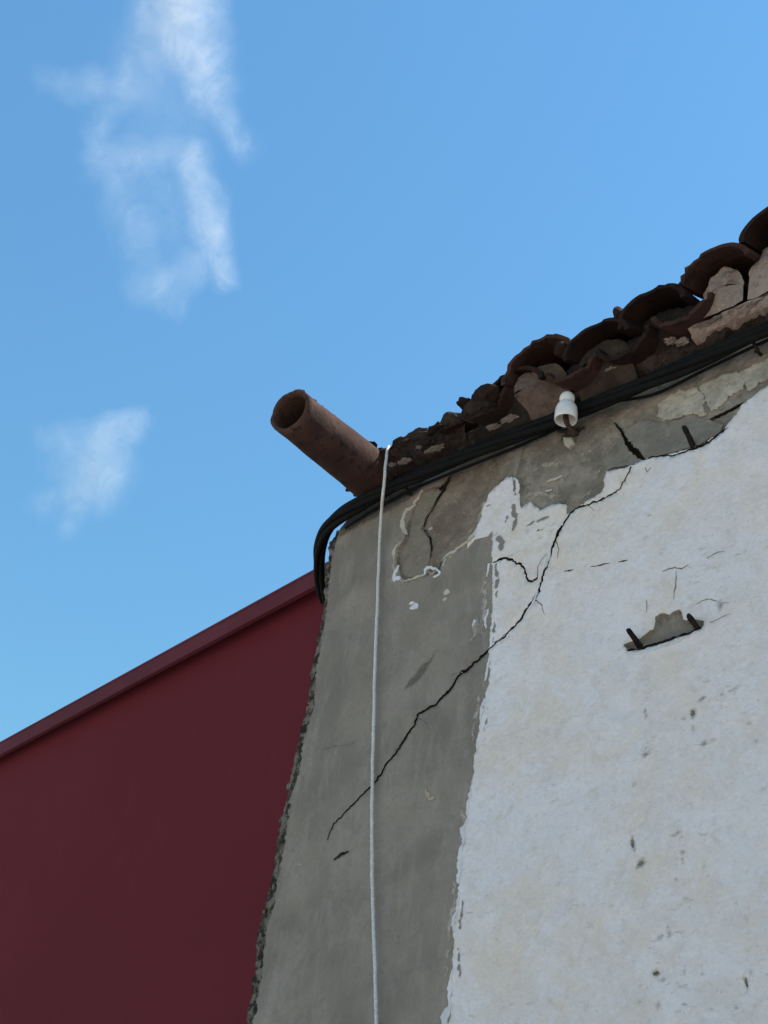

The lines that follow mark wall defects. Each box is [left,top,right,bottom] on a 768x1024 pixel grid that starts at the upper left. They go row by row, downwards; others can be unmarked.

peeling [471,563,499,643]
crack [327,402,743,860]
spalling [623,605,723,655]
spalling [246,530,339,1024]
peeling [447,785,472,935]
peeling [440,948,461,1024]